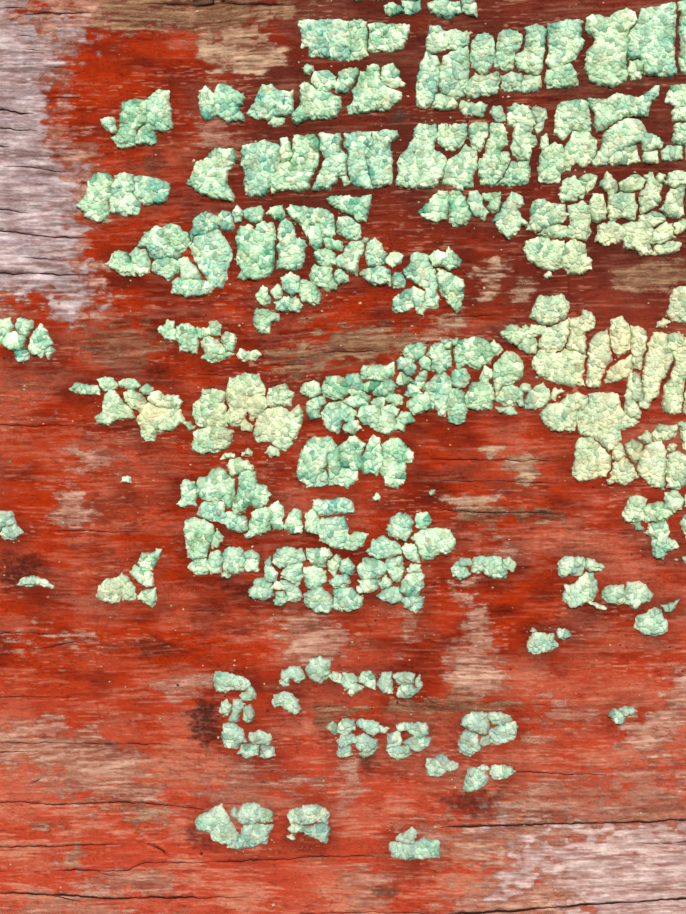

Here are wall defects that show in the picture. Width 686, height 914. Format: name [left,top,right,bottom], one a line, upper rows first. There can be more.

crack [220,0,281,8]
peeling [0,0,686,715]
crack [443,459,566,483]
peeling [389,489,686,914]
peeling [313,704,432,761]
peeling [0,714,167,835]
peeling [192,671,331,850]
crack [0,801,206,810]
crack [0,830,118,848]
crack [441,817,686,844]
crack [0,855,378,902]
crack [301,897,686,914]